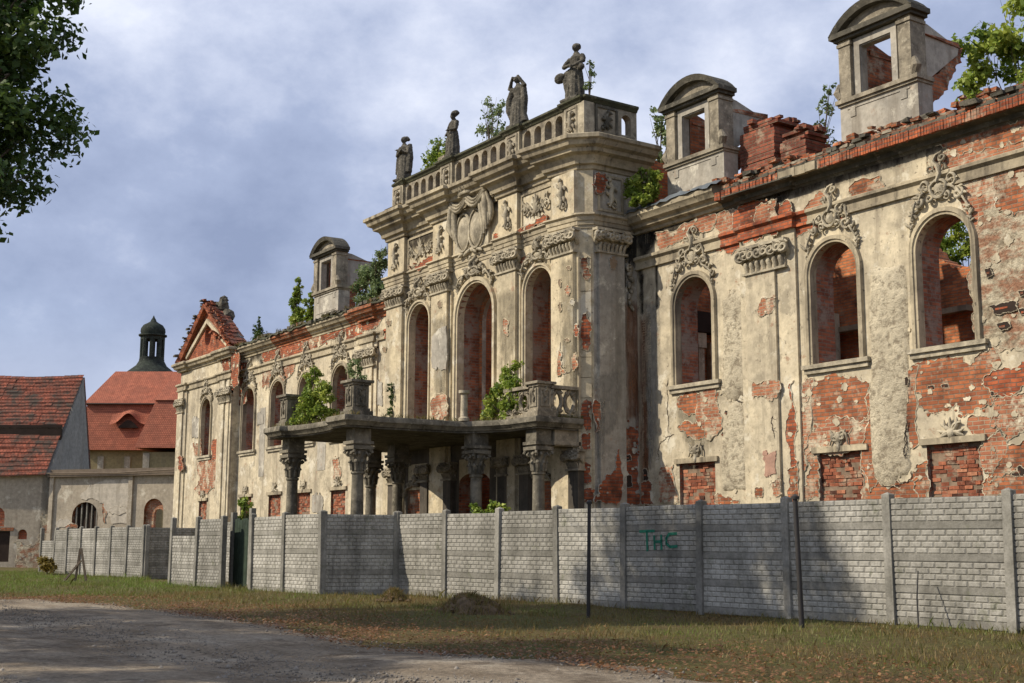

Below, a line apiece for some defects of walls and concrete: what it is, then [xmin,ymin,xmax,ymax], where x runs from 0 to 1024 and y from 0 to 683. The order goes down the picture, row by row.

flaking render [926,119,1024,170]
flaking render [592,172,609,195]
flaking render [654,190,828,250]
flaking render [714,231,778,255]
flaking render [557,256,592,377]
flaking render [904,167,1024,496]
flaking render [222,349,248,406]
flaking render [177,438,217,496]
flaking render [430,393,449,421]
flaking render [580,399,679,506]
flaking render [676,388,728,441]
flaking render [751,372,931,501]